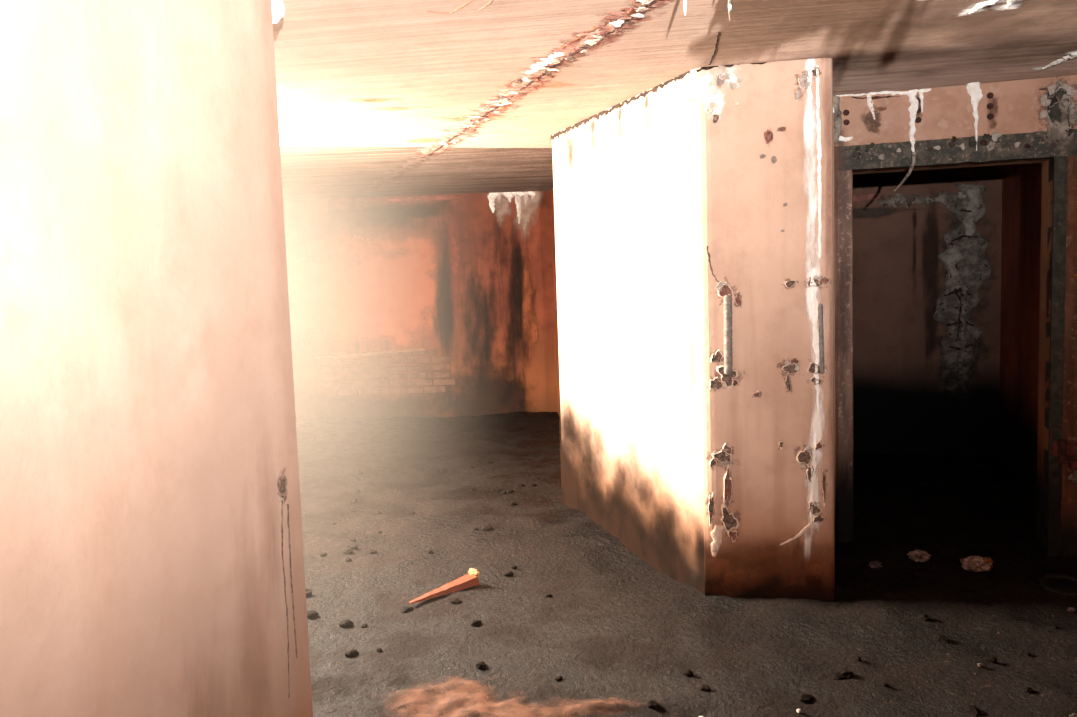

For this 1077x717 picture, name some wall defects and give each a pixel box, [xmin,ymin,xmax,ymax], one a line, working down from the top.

water stain [836,88,931,120]
spalling [1038,78,1077,147]
water stain [488,191,540,228]
spalling [708,281,742,390]
spalling [777,304,827,395]
water stain [780,59,833,556]
spalling [784,275,832,288]
spalling [705,443,740,542]
spalling [778,441,827,523]